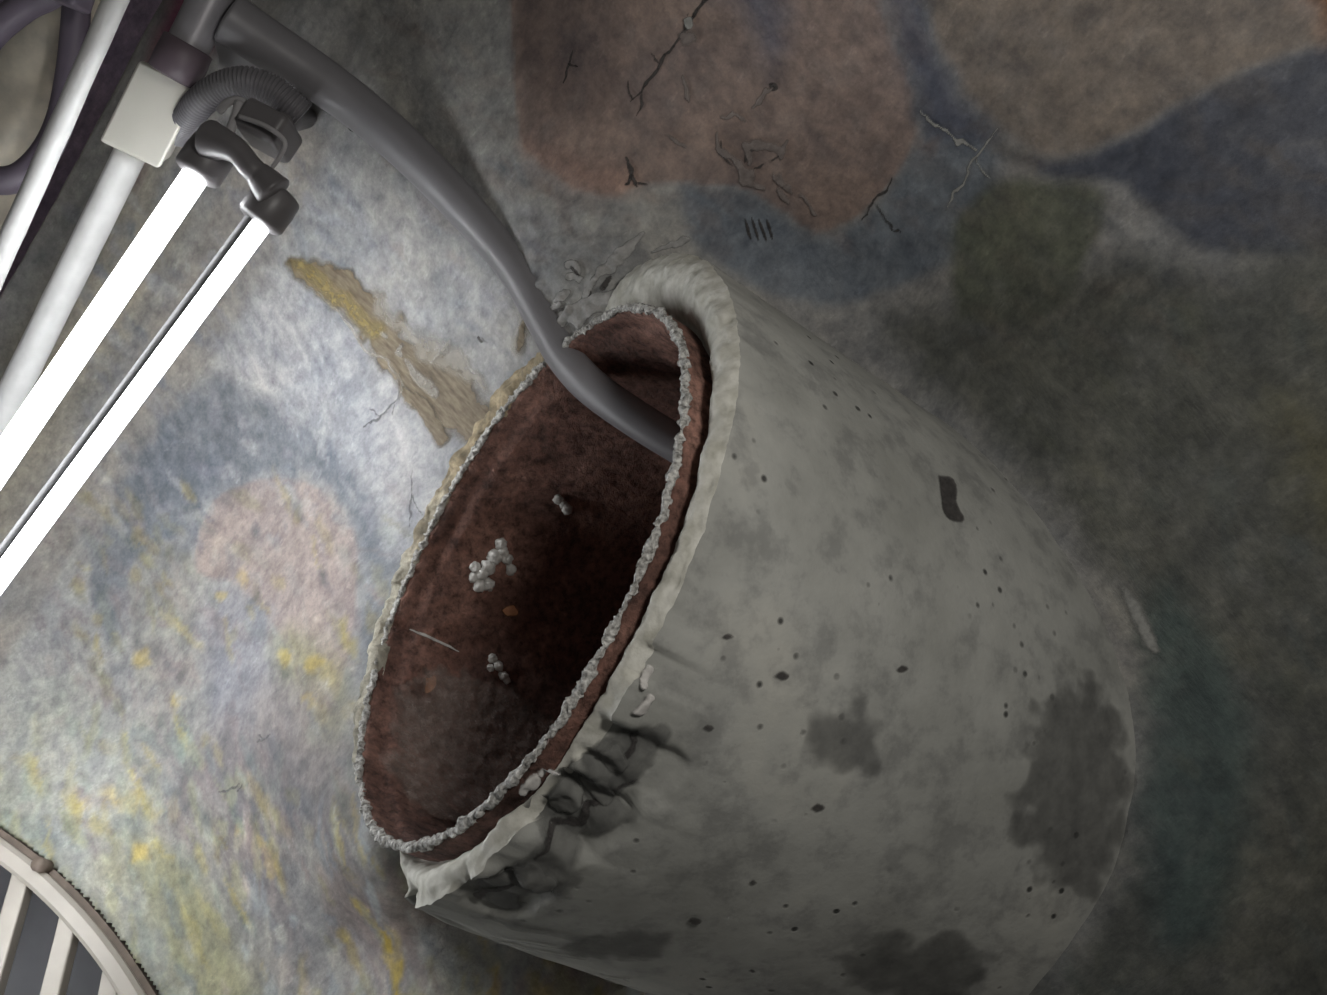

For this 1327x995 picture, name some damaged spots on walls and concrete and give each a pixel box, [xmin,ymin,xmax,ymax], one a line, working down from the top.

crack [627,0,708,116]
crack [625,157,646,187]
crack [862,178,901,233]
spalling [473,665,671,910]